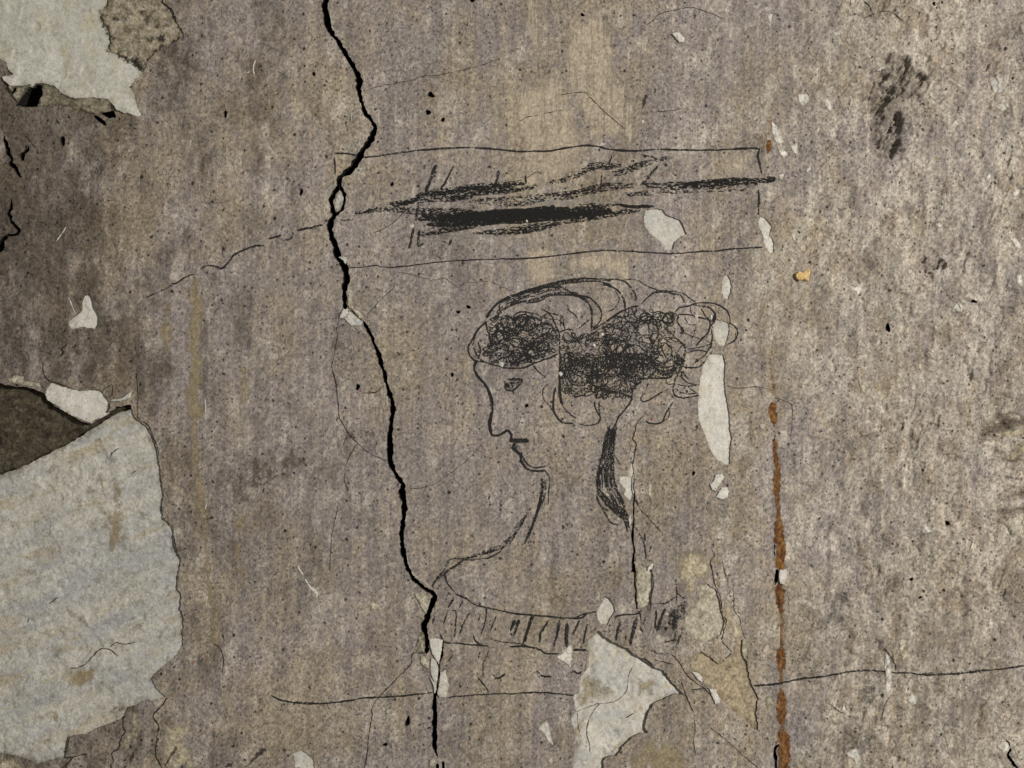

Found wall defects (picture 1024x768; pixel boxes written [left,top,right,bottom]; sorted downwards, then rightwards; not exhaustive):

flaking render [0,0,184,126]
flaking render [69,294,100,329]
crack [321,0,512,768]
flaking render [644,209,686,250]
flaking render [698,320,732,499]
flaking render [0,374,184,764]
corrosion [768,347,791,768]
flaking render [571,596,683,768]